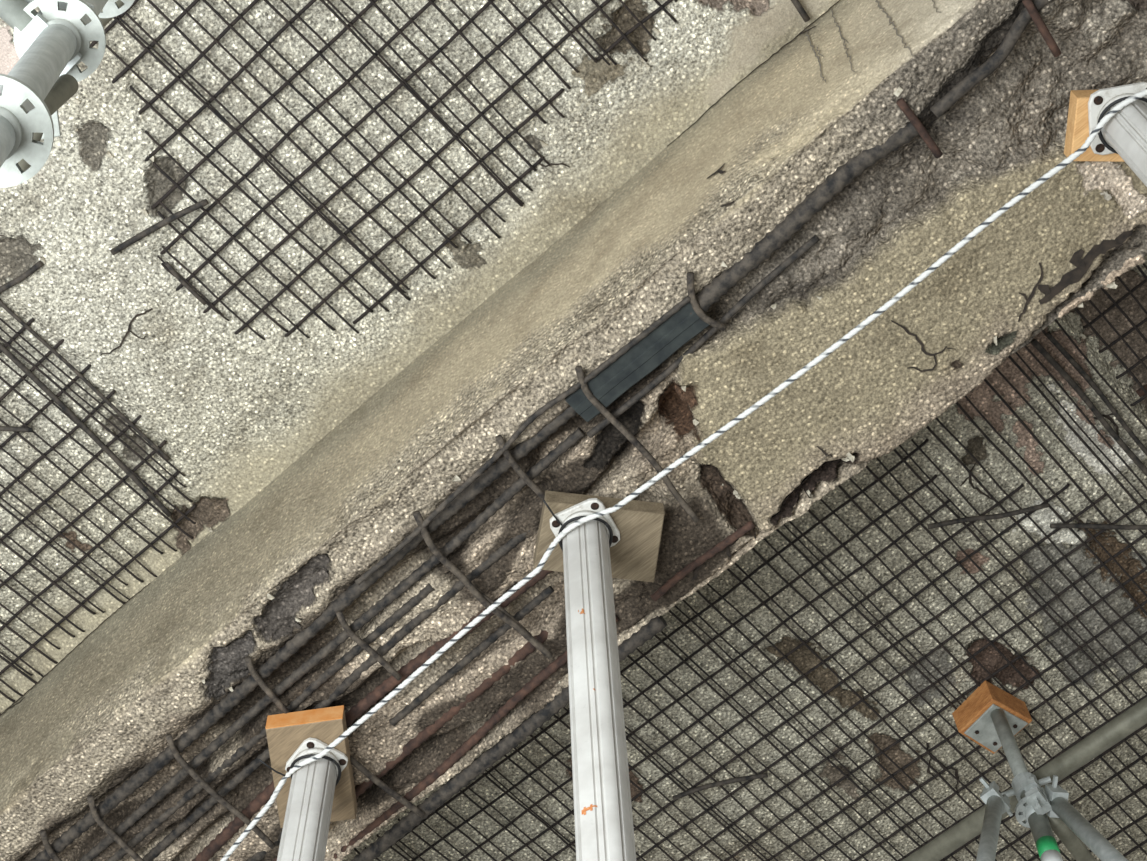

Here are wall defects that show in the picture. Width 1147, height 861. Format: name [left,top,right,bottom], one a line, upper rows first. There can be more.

peeling [0,26,19,75]
spalling [697,0,770,16]
spalling [72,98,114,186]
spalling [90,0,677,340]
spalling [708,0,1147,319]
spalling [0,236,45,300]
crack [1018,227,1136,322]
crack [891,320,956,372]
spalling [1042,247,1147,430]
spalling [0,317,1147,861]